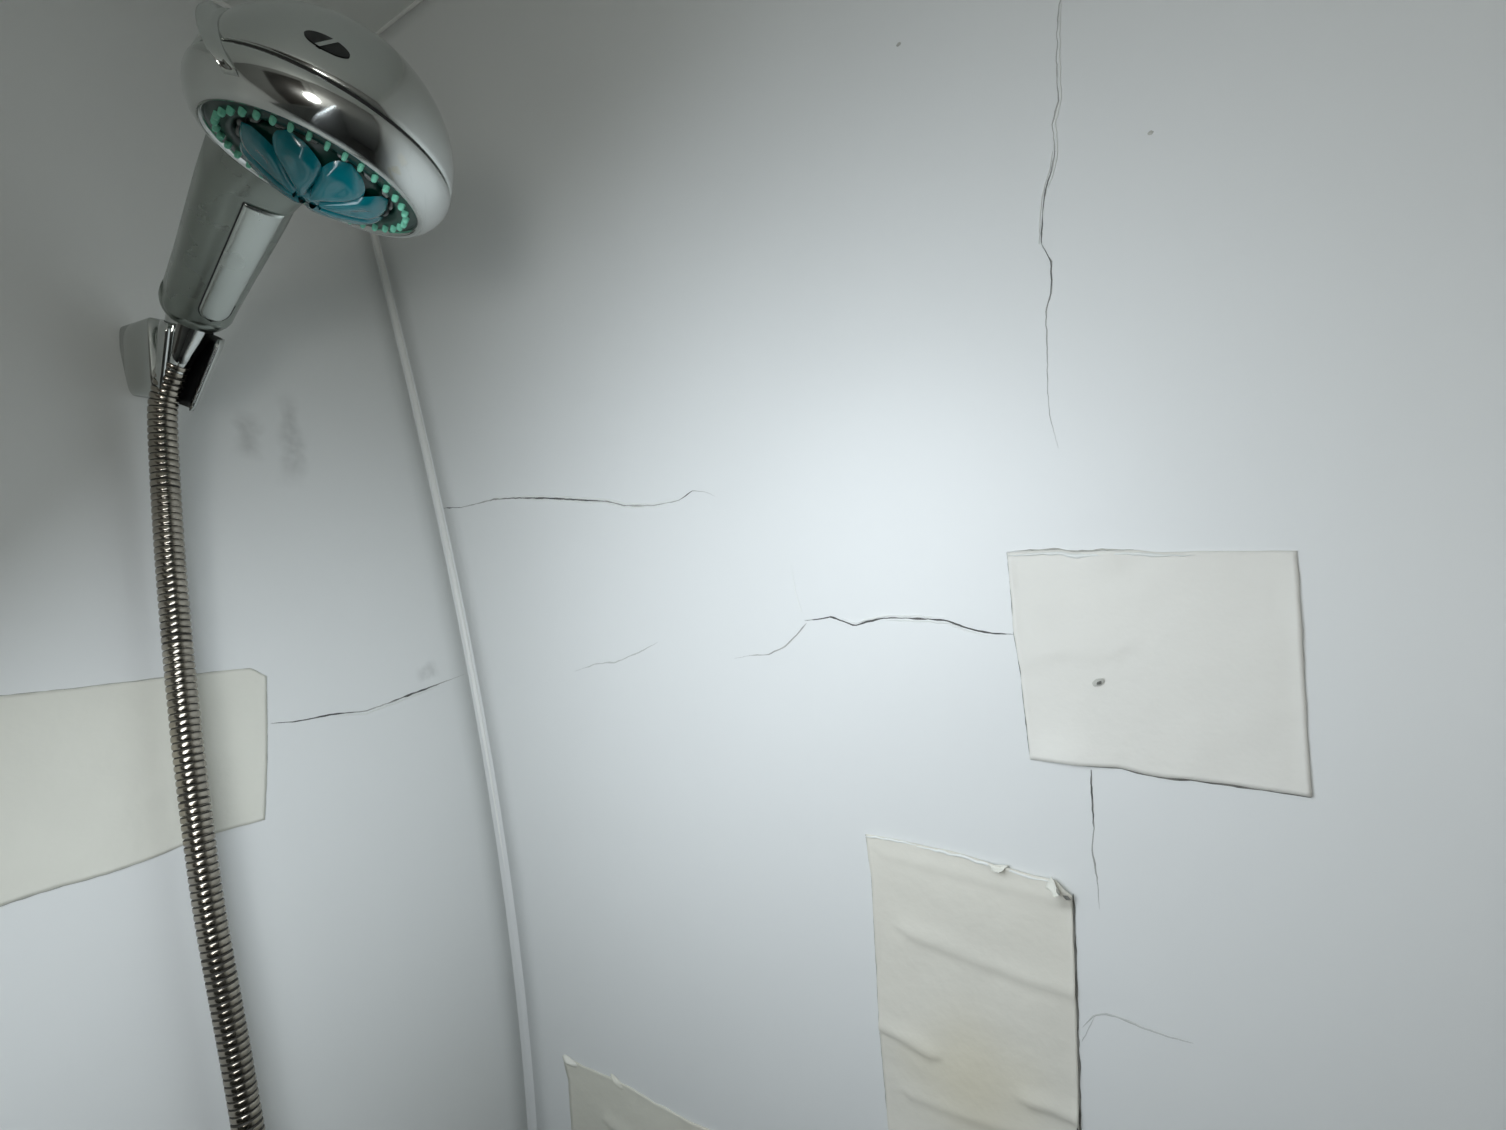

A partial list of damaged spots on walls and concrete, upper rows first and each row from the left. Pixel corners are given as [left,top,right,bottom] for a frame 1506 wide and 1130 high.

crack [1038,0,1062,445]
crack [447,490,712,509]
crack [740,565,1005,658]
crack [576,642,658,671]
crack [278,674,464,723]